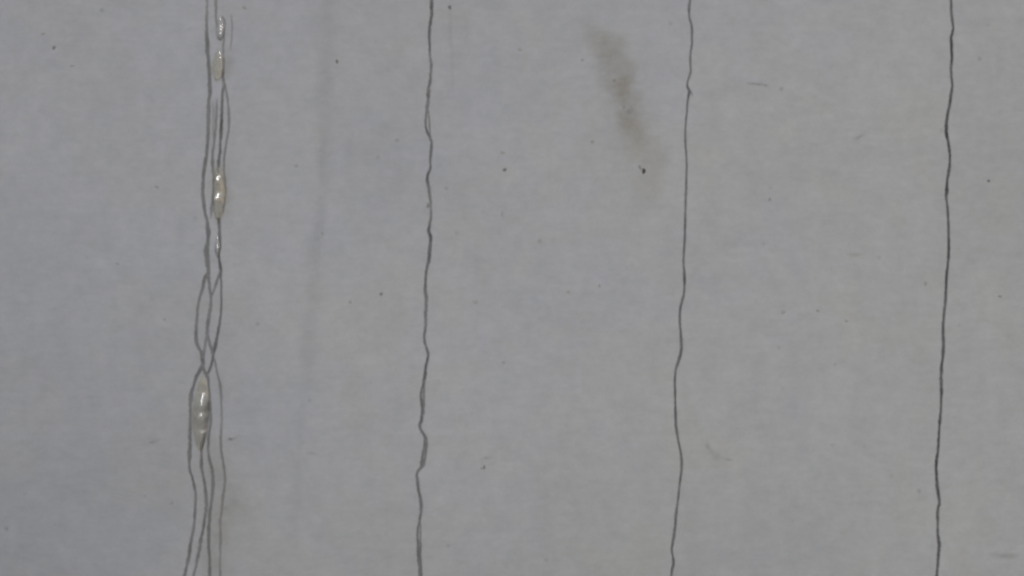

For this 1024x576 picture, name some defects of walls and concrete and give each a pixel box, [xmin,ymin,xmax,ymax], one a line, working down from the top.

crack [183,0,233,576]
crack [416,0,434,576]
crack [671,0,693,576]
crack [935,0,954,576]